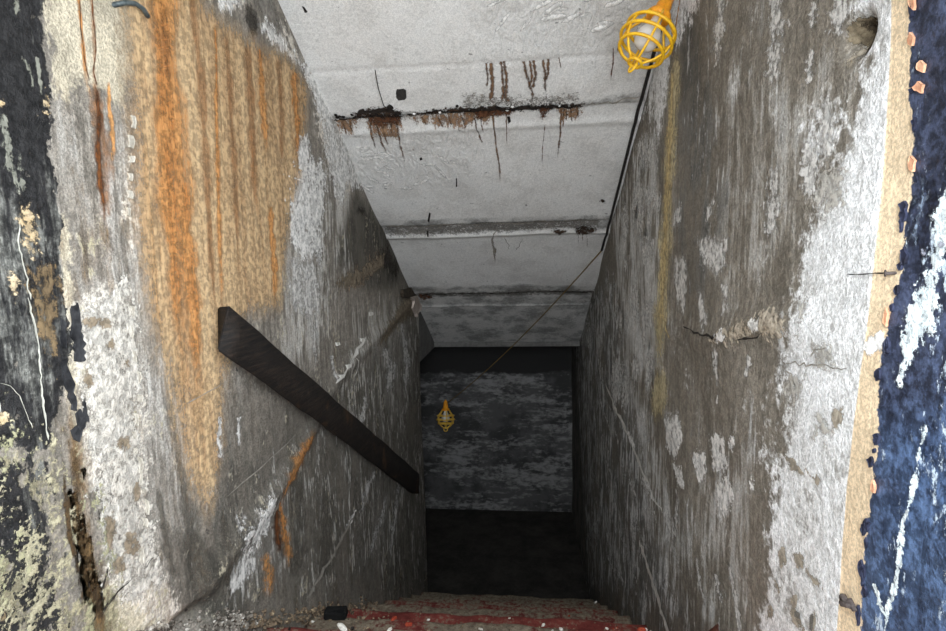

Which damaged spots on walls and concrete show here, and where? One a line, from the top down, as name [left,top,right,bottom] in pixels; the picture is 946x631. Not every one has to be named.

peeling [21,57,50,115]
corrosion [485,61,509,101]
corrosion [522,58,561,98]
spalling [846,16,878,67]
peeling [908,0,916,18]
peeling [908,60,927,93]
peeling [0,100,26,194]
peeling [126,115,137,216]
corrosion [128,0,307,503]
peeling [863,188,946,387]
peeling [8,204,166,618]
corrosion [264,436,313,591]